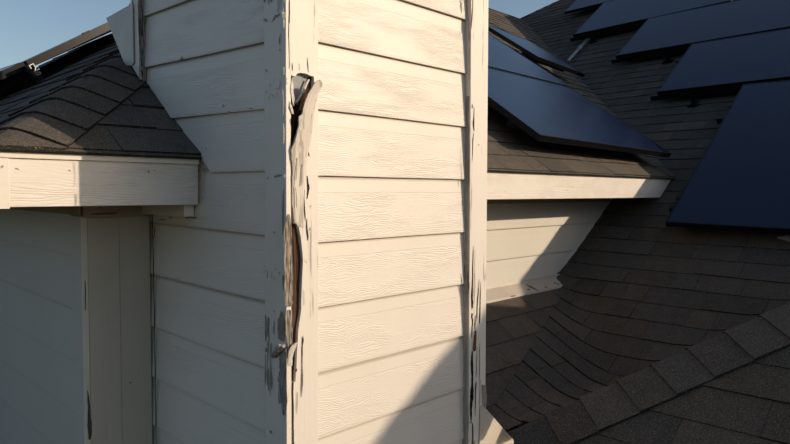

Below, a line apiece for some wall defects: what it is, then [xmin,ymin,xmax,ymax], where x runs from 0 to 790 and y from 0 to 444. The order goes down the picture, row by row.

spalling [265,211,301,416]